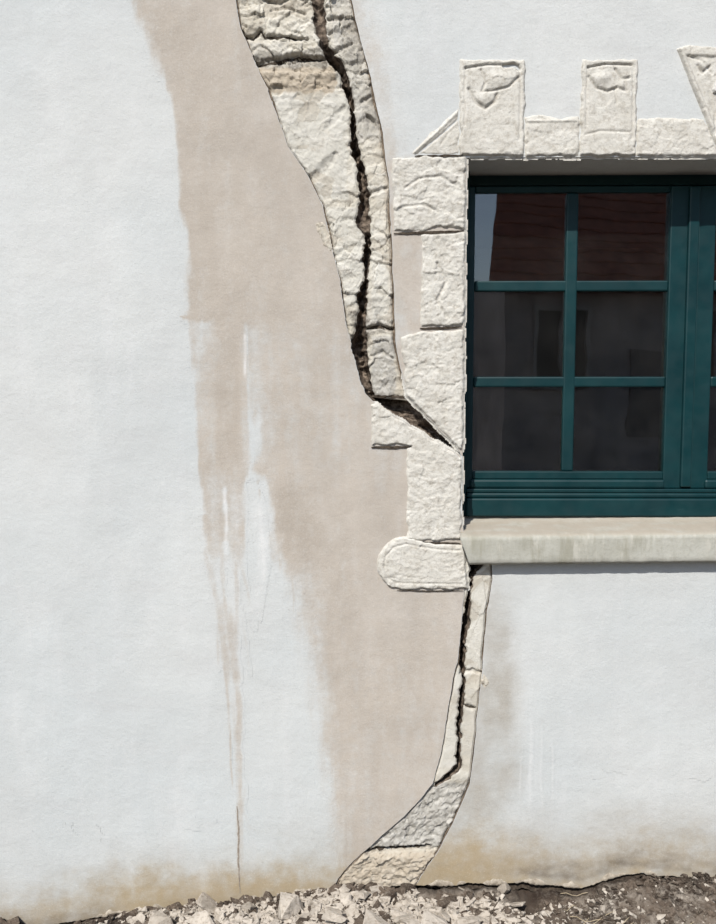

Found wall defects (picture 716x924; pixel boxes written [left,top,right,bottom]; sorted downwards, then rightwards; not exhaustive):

spalling [237,0,408,401]
crack [236,0,460,454]
damp [128,0,466,868]
spalling [338,559,492,887]
crack [336,564,662,895]